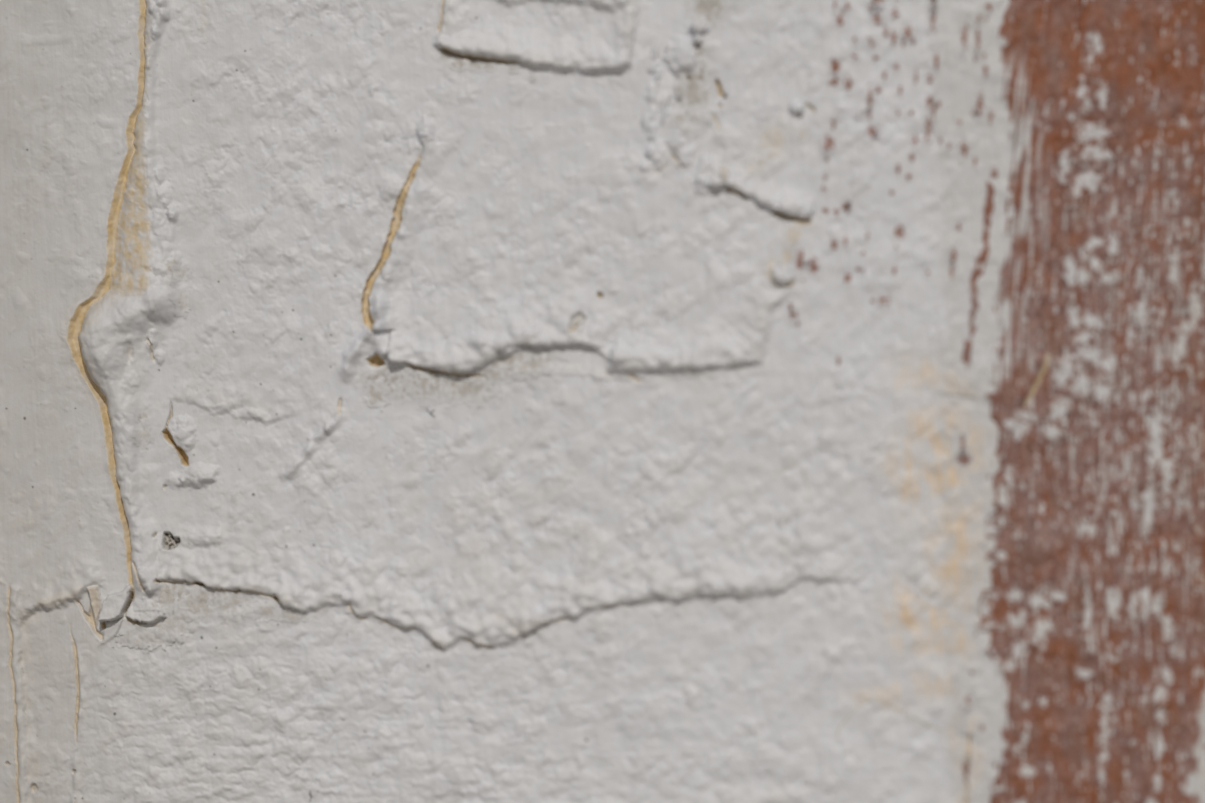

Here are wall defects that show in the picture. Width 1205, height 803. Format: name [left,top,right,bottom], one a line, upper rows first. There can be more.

peeling [1055,24,1121,211]
crack [6,582,29,803]
crack [68,623,88,803]
peeling [72,582,165,649]
spalling [152,529,184,554]
crack [348,596,661,652]
spalling [565,309,590,333]
peeling [958,694,1049,803]
peeling [979,228,1127,564]
peeling [975,577,1182,803]
peeling [1137,383,1178,548]
peeling [1130,231,1205,373]